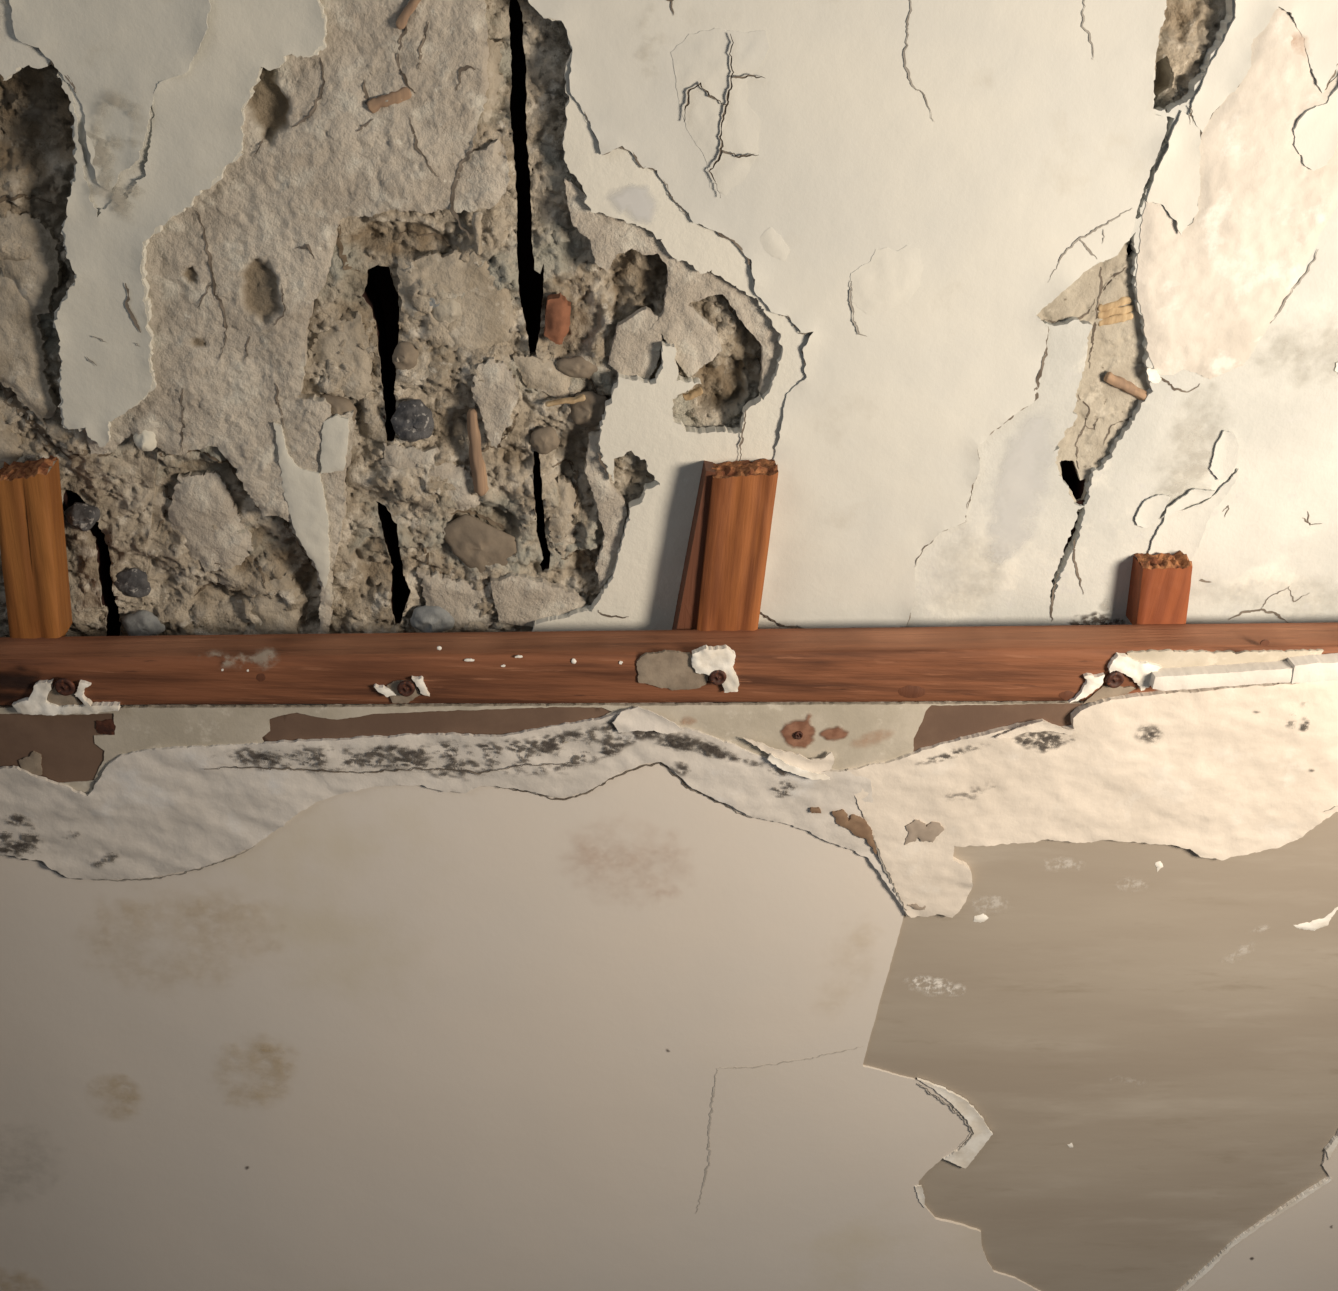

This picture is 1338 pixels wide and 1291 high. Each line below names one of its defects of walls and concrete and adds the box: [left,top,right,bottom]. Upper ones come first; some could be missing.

crack [684,34,764,198]
crack [362,265,400,441]
peeling [0,0,1338,637]
crack [377,502,411,624]
crack [533,451,551,571]
crack [1050,500,1085,620]
water stain [0,815,39,856]
water stain [236,720,759,777]
water stain [773,769,795,797]
corrosion [781,715,848,748]
water stain [1016,731,1065,752]
peeling [863,812,1338,1291]